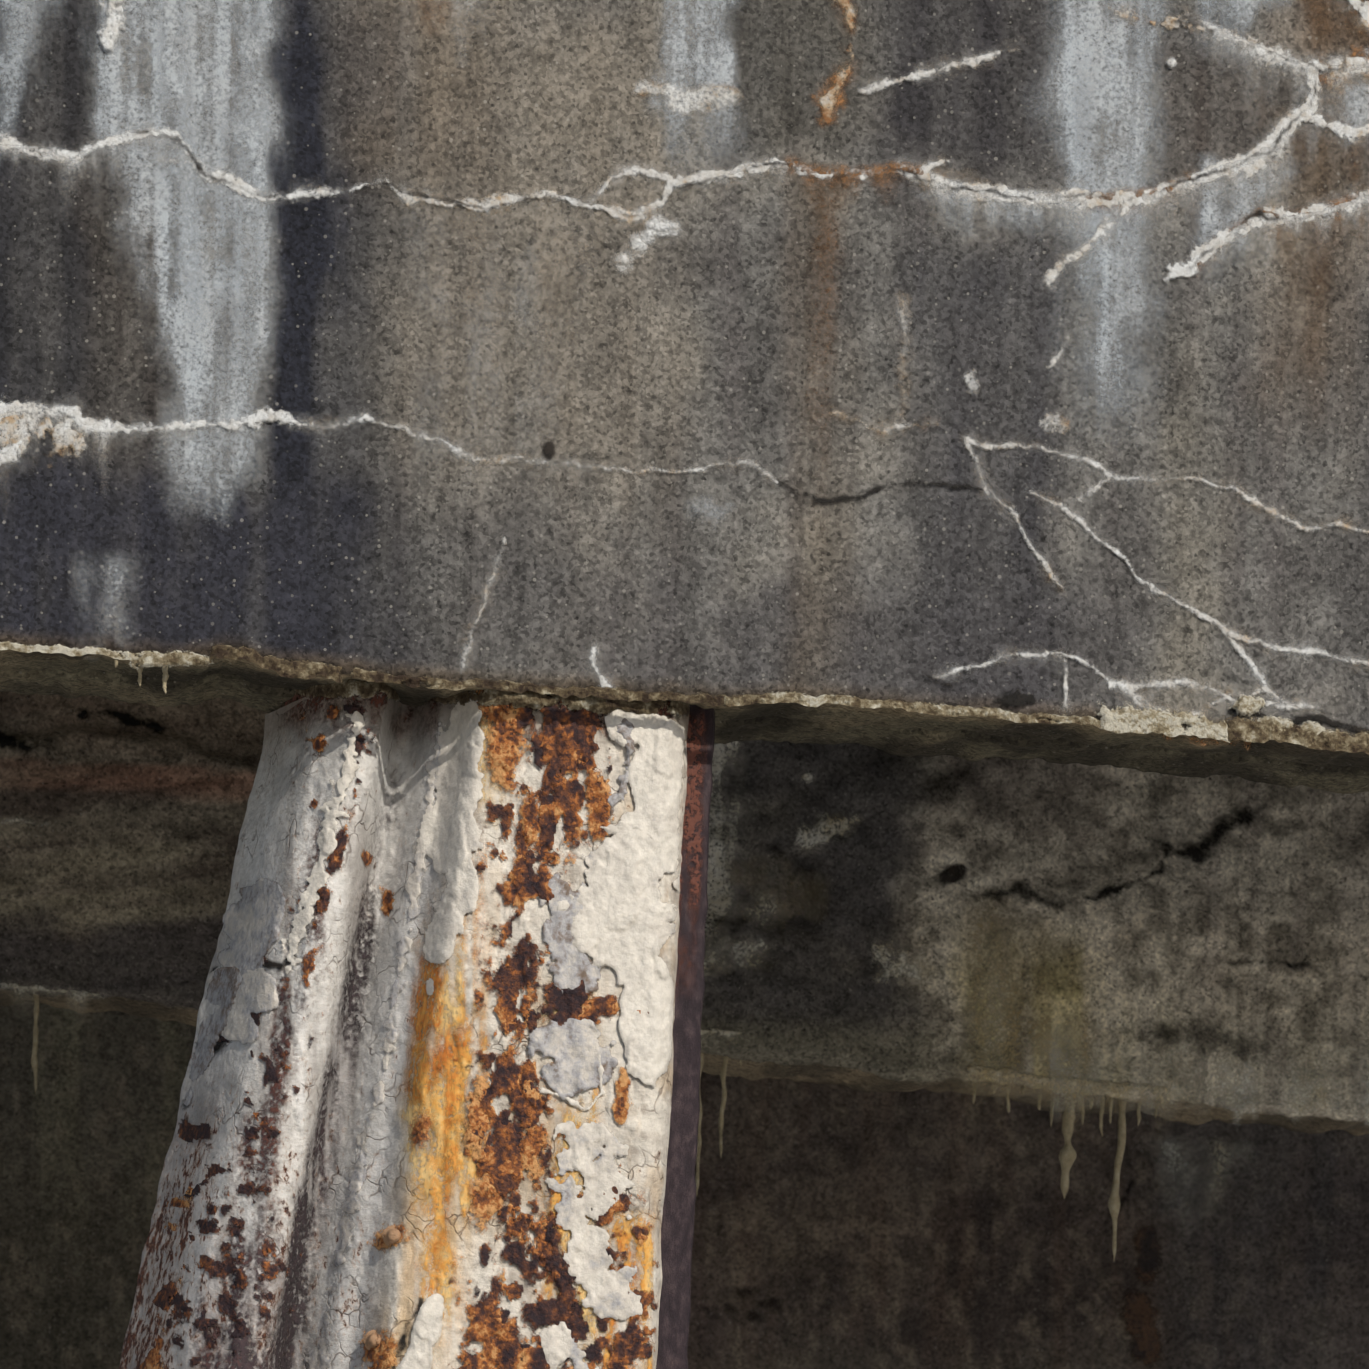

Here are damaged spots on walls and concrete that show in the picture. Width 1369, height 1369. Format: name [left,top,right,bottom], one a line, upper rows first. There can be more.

leakage [93,0,280,504]
leakage [617,215,679,271]
crack [0,0,1369,285]
leakage [635,0,739,136]
crack [1048,351,1061,367]
leakage [1048,0,1176,406]
leakage [1199,158,1268,257]
crack [0,400,1369,717]
leakage [704,741,777,969]
crack [985,806,1258,907]
rust [367,690,660,1369]
peeling [0,641,1369,1369]